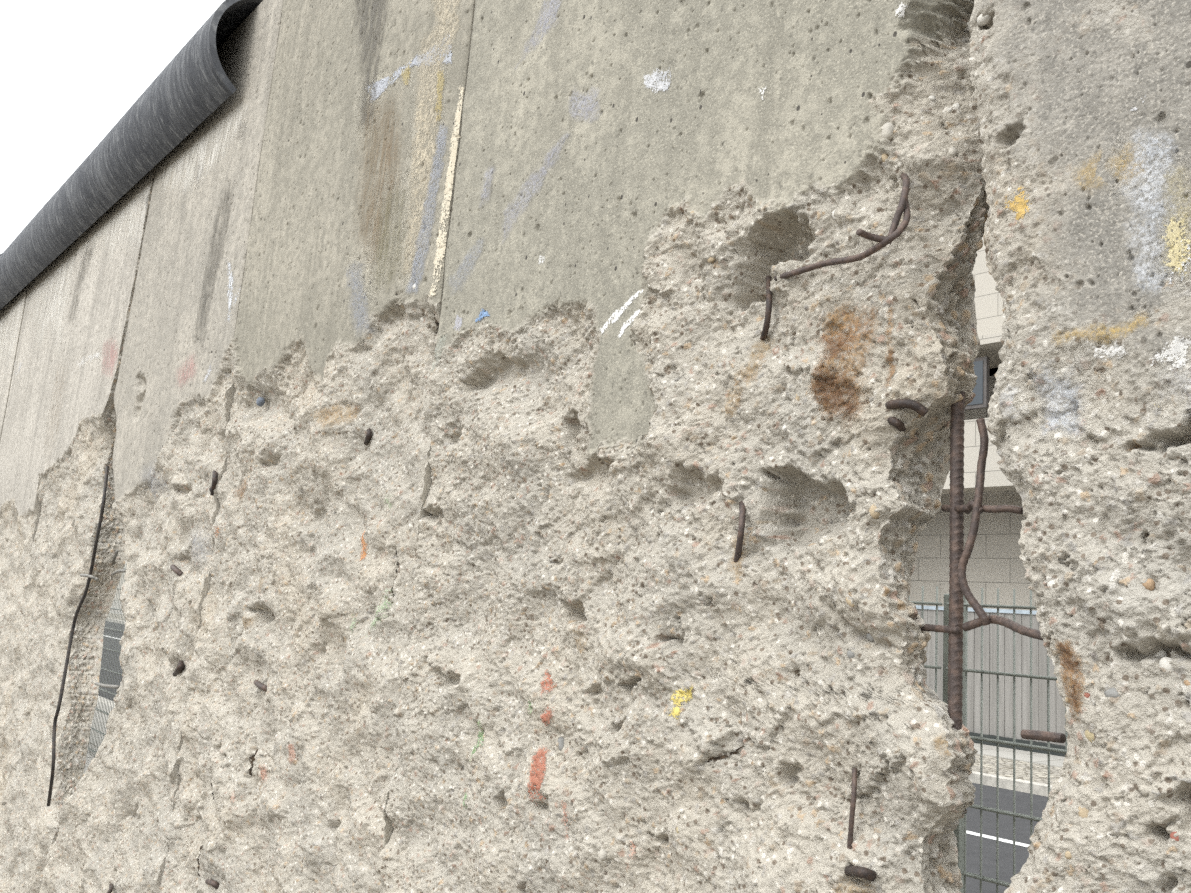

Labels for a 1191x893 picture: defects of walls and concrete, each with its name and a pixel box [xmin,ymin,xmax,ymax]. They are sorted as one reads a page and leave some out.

spalling [0,297,440,893]
spalling [376,0,984,893]
rust [812,306,873,412]